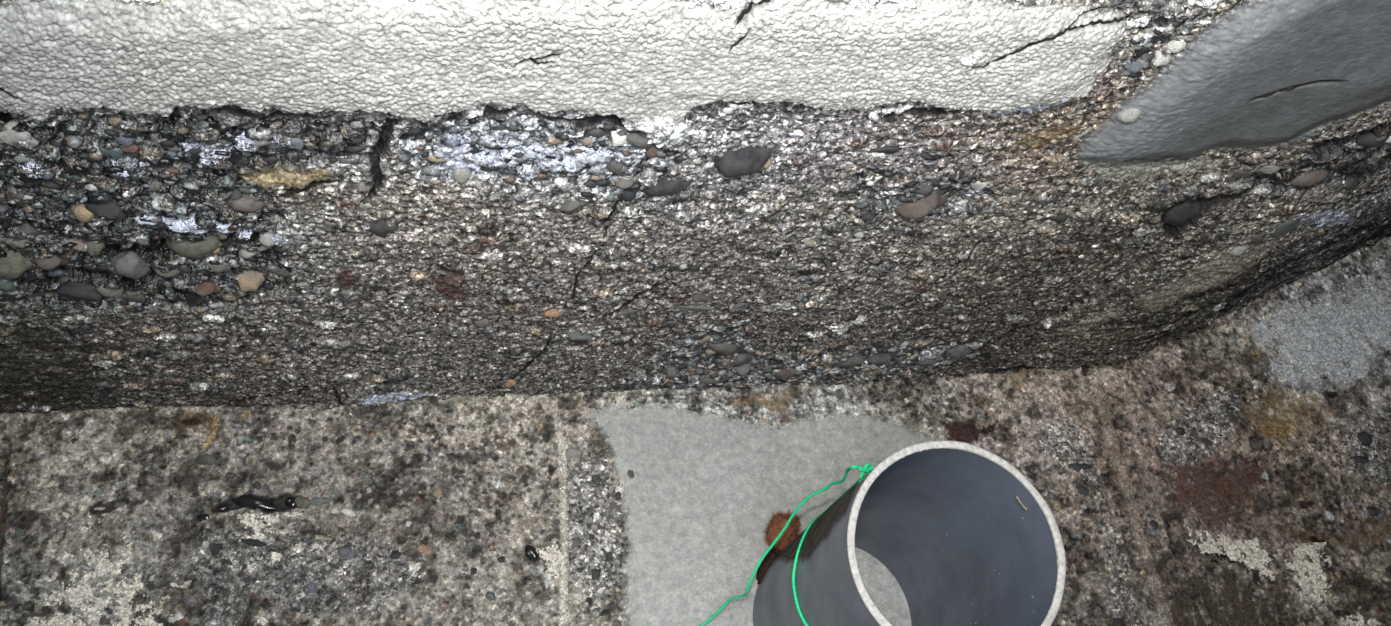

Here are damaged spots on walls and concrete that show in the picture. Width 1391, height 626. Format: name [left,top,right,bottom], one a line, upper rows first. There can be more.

crack [728,0,771,53]
crack [966,7,1154,72]
flaking render [0,119,32,146]
flaking render [13,172,43,189]
flaking render [225,146,243,164]
efflorescence [428,116,694,183]
flaking render [582,128,691,202]
flaking render [714,145,772,178]
flaking render [867,145,900,154]
flaking render [970,181,988,190]
flaking render [363,203,398,237]
flaking render [0,197,275,306]